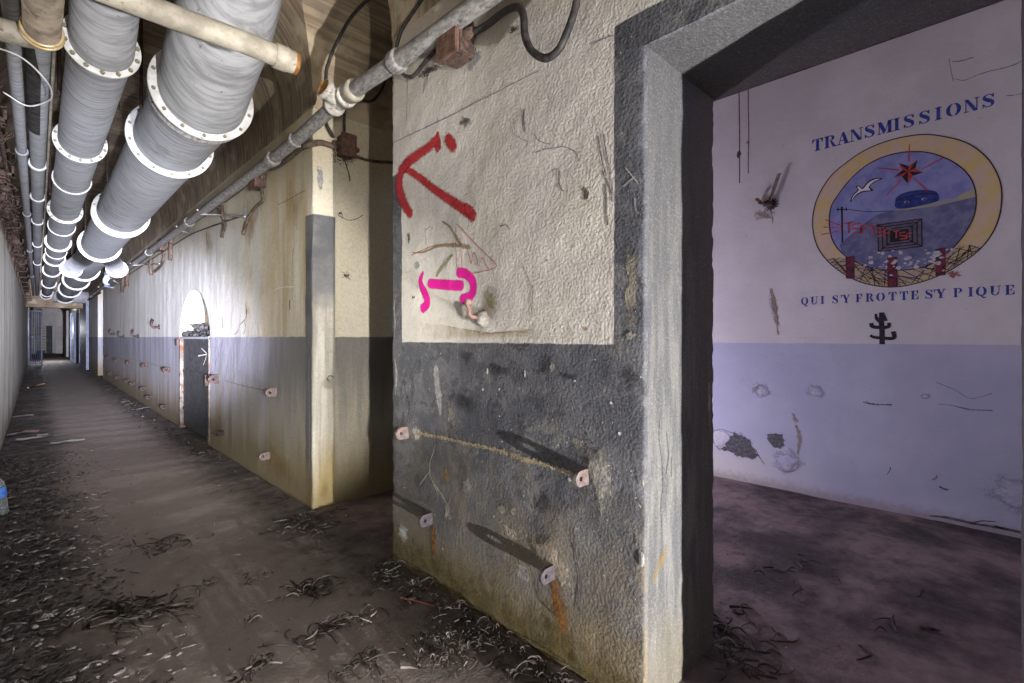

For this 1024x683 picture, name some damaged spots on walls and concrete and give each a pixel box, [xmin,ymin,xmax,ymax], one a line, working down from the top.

spalling [708,381,764,463]
spalling [767,433,784,449]